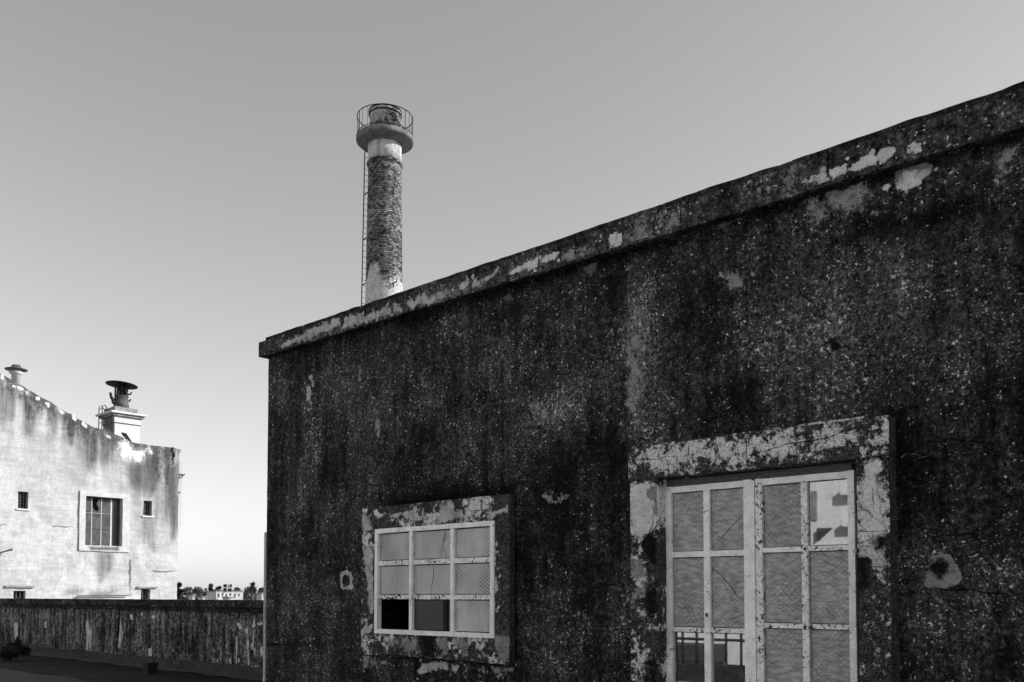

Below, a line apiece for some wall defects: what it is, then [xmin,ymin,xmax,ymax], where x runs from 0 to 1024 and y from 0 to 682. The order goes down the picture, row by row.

spalling [799,141,938,232]
peeling [278,246,598,349]
damp [169,467,177,532]
damp [385,487,515,523]
peeling [853,446,887,568]
peeling [340,498,509,637]
peeling [630,482,657,605]
spalling [923,552,963,589]
damp [118,613,155,648]
damp [217,619,263,665]
spalling [362,634,470,680]
damp [421,635,434,658]